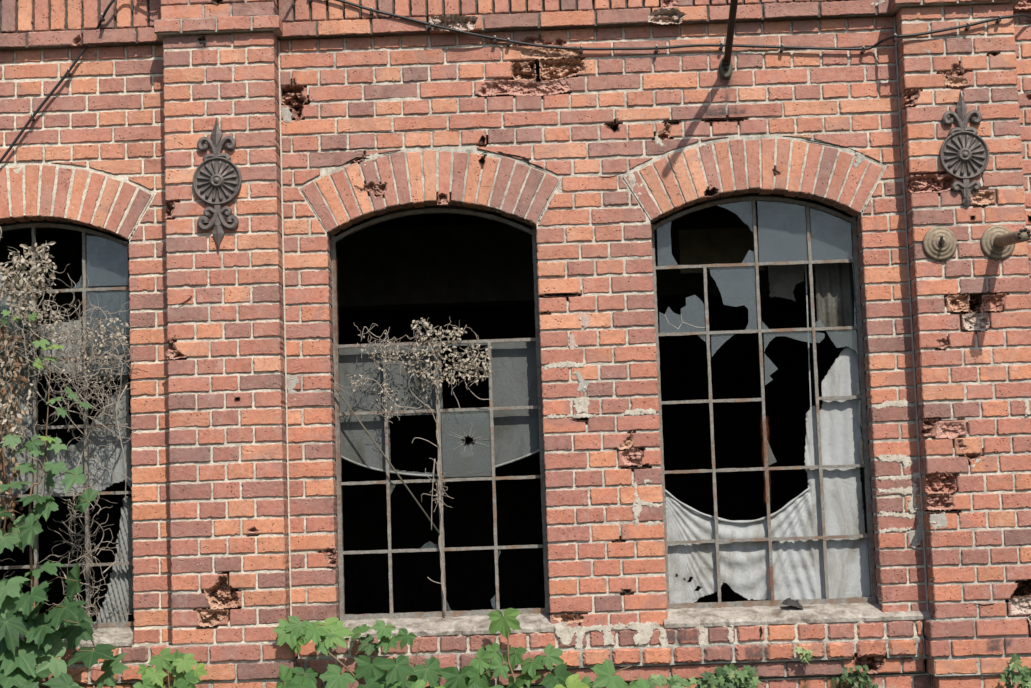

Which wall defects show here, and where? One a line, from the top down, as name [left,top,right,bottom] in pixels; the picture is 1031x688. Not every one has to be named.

spalling [648,0,686,25]
spalling [477,37,585,96]
spalling [281,79,308,122]
spalling [907,174,957,193]
spalling [945,293,1007,331]
spalling [617,431,644,466]
spalling [921,419,983,461]
spalling [196,575,239,627]
spalling [1008,579,1031,624]